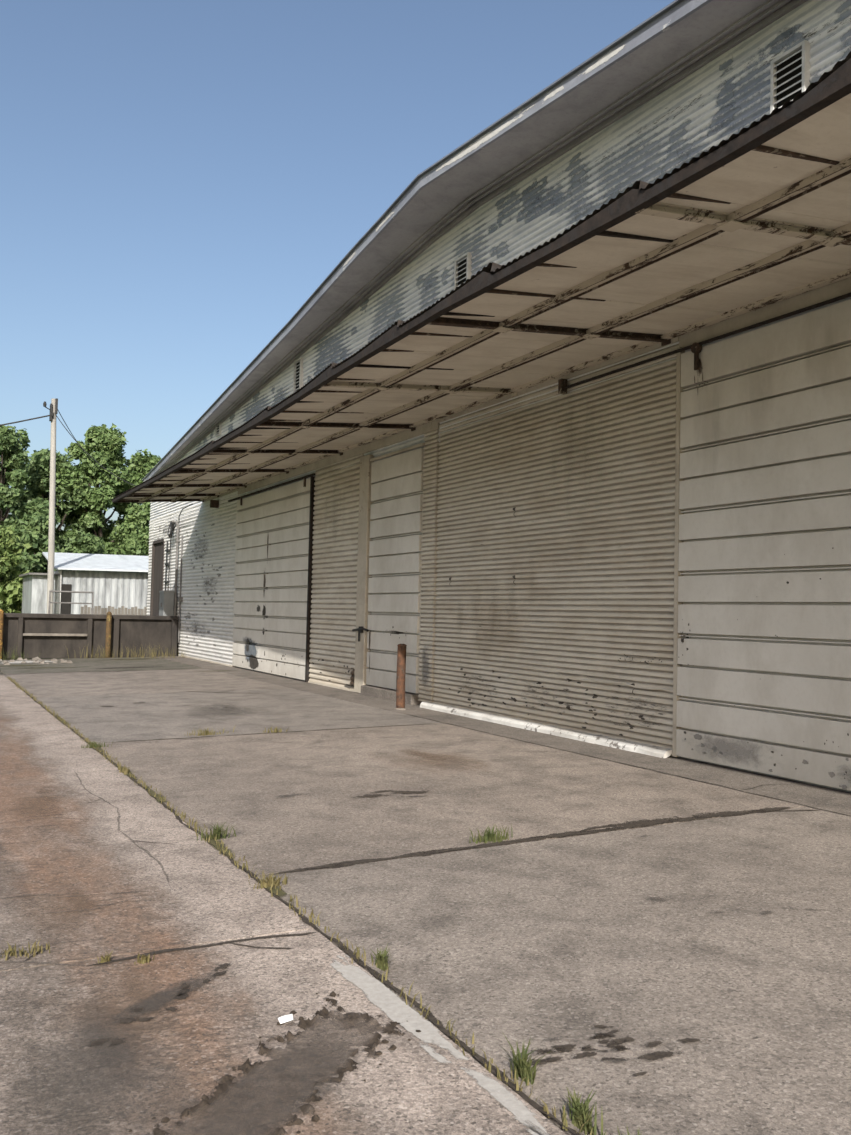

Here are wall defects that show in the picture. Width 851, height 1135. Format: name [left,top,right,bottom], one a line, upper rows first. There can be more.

peeling [308,0,851,382]
crack [0,672,850,1135]